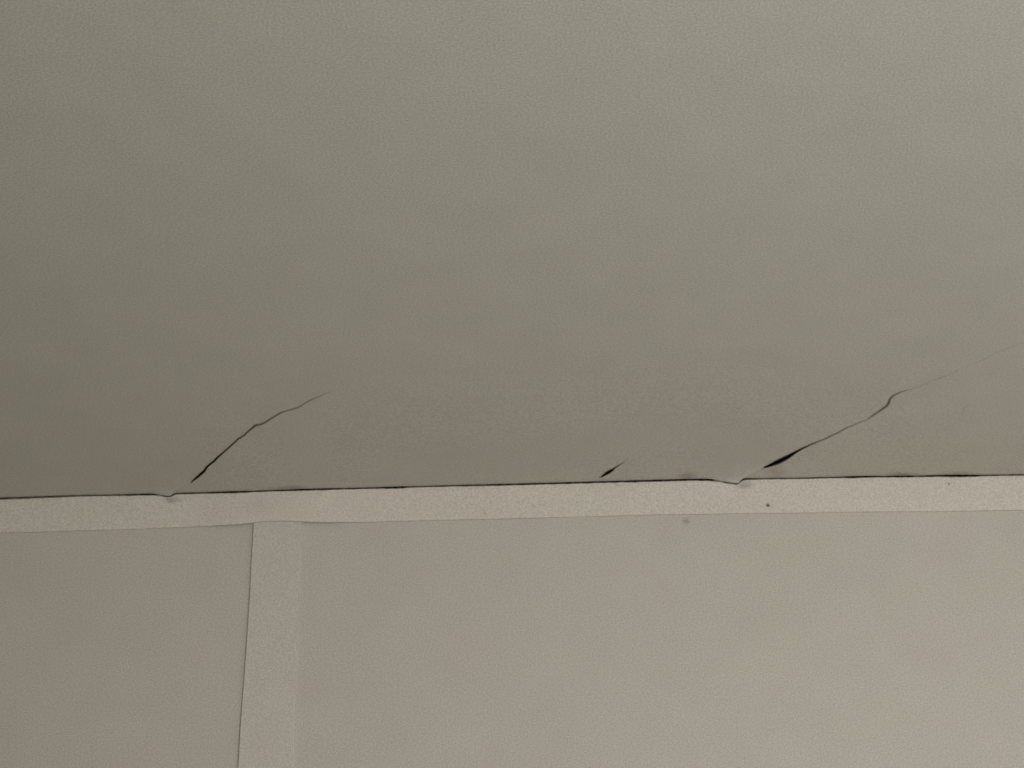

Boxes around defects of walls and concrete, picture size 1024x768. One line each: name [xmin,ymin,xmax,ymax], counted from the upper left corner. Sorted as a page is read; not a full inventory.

crack [0,493,74,501]
crack [117,422,1024,497]